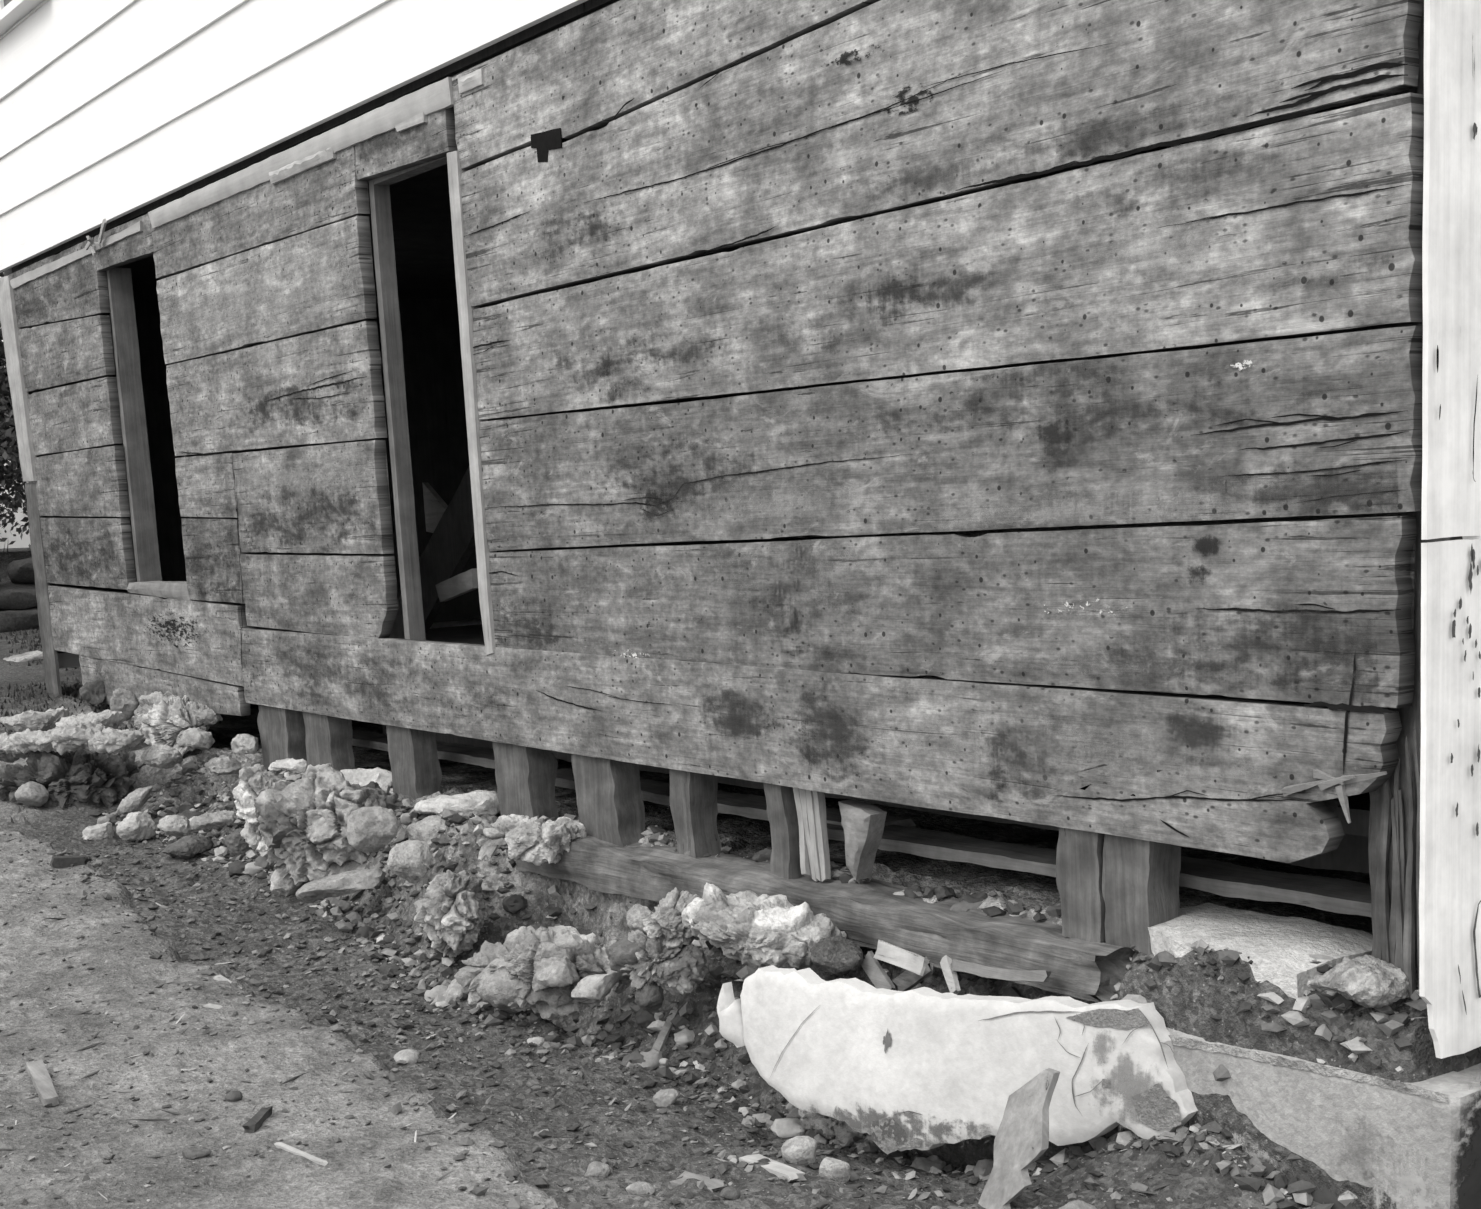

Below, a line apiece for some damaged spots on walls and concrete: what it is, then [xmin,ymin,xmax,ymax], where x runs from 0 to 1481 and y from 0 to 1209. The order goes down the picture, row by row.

crack [956,62,1408,191]
crack [705,226,776,252]
water stain [1037,367,1155,466]
crack [1195,345,1478,504]
water stain [703,692,768,738]
water stain [791,693,867,779]
crack [1057,790,1311,838]
water stain [1456,1109,1481,1209]